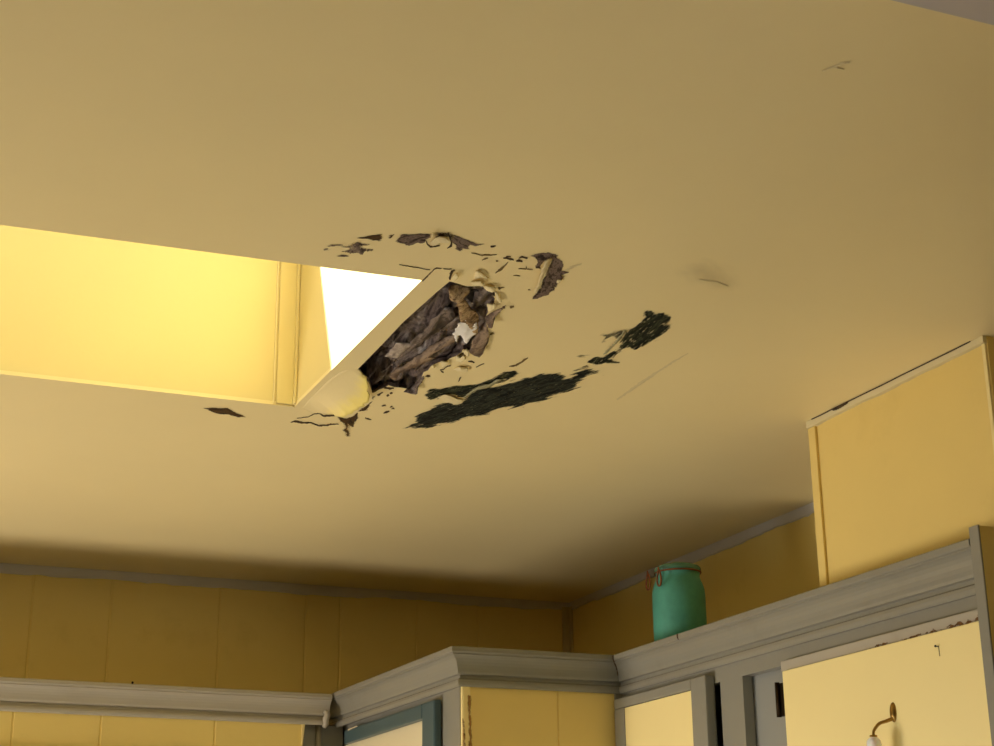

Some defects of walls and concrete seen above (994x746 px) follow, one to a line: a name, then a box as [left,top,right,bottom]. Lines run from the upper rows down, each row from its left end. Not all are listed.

peeling [360,232,482,251]
peeling [532,253,569,299]
crack [421,352,484,383]
water stain [405,311,671,429]
peeling [204,408,244,417]
peeling [303,369,378,436]
crack [291,387,394,427]